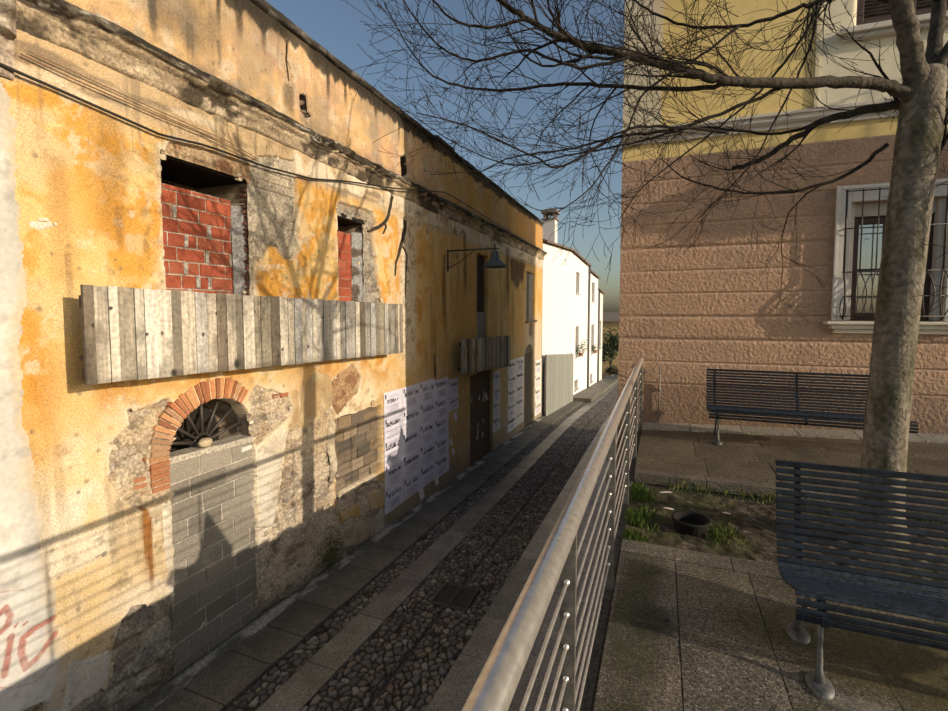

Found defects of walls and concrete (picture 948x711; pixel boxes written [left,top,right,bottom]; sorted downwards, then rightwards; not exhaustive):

damp [235,0,286,38]
spalling [299,92,311,123]
peeling [159,142,298,295]
flaking render [62,399,178,711]
rust [139,507,153,579]
flaking render [246,364,385,616]